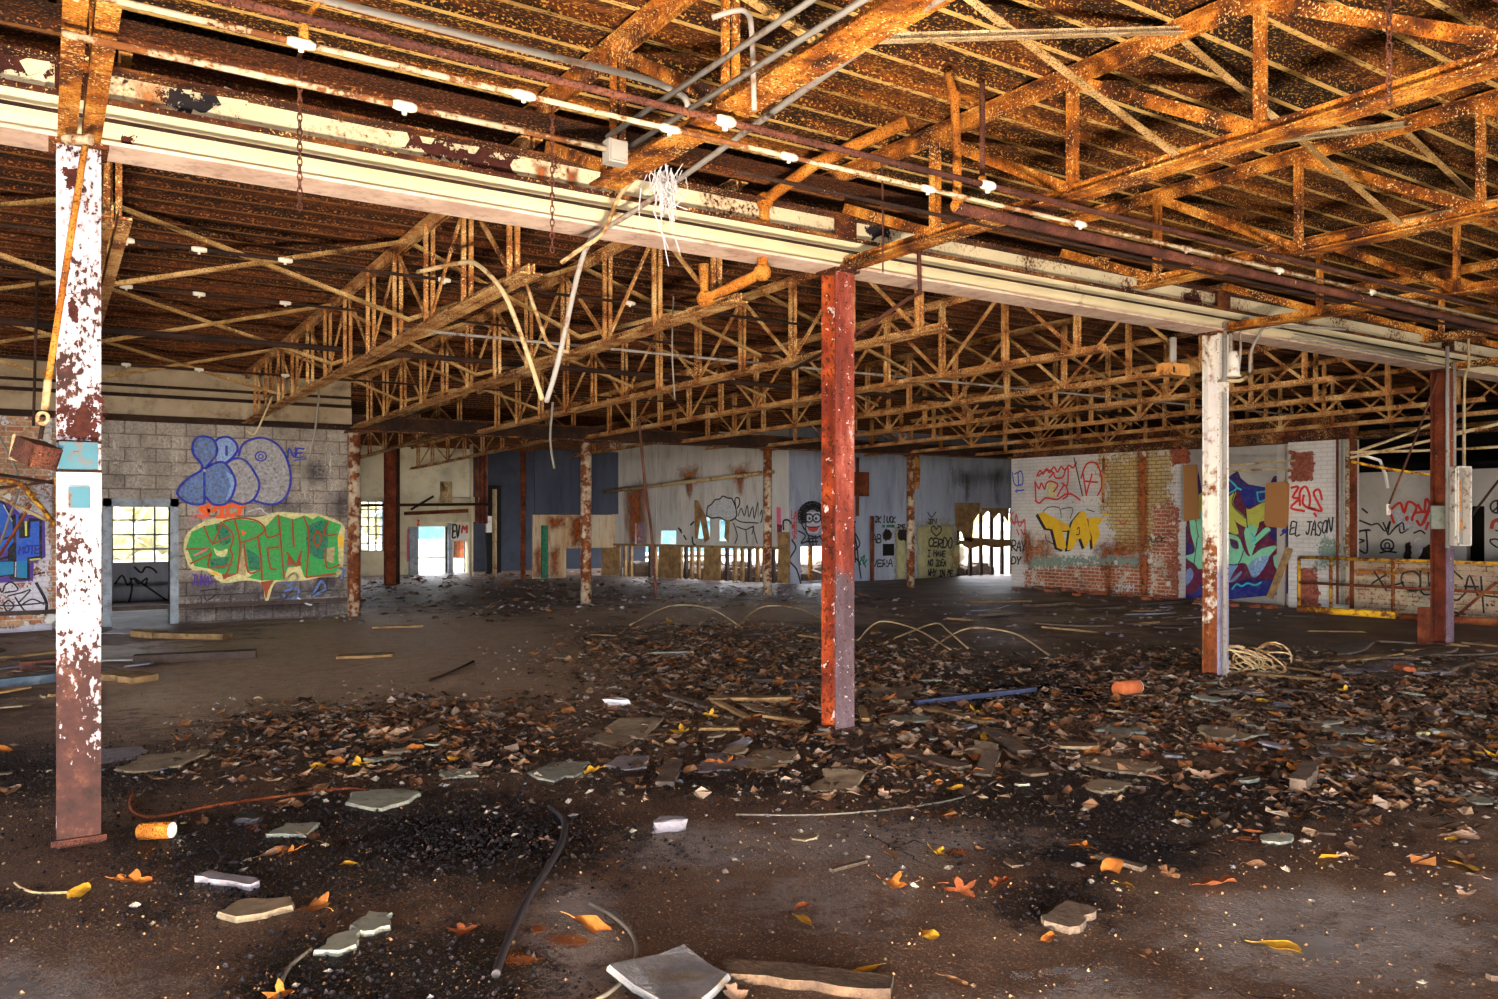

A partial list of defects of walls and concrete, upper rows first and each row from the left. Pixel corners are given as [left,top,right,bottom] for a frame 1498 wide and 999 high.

peeling [0,53,54,86]
peeling [155,73,248,121]
peeling [390,126,529,175]
peeling [60,166,78,190]
peeling [68,290,79,323]
rust [1180,289,1202,303]
peeling [1014,443,1191,597]